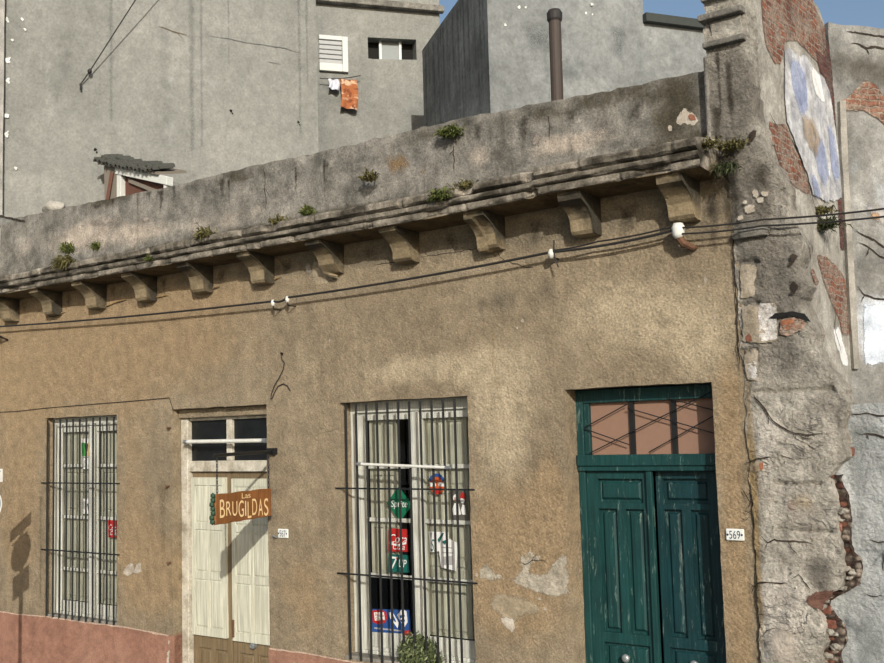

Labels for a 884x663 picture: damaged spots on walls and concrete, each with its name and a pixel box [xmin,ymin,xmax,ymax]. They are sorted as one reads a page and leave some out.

crack [847,31,884,53]
spalling [668,108,698,131]
peeling [762,0,884,250]
peeling [740,264,805,380]
spalling [811,255,849,366]
peeling [123,563,142,576]
peeling [475,550,569,632]